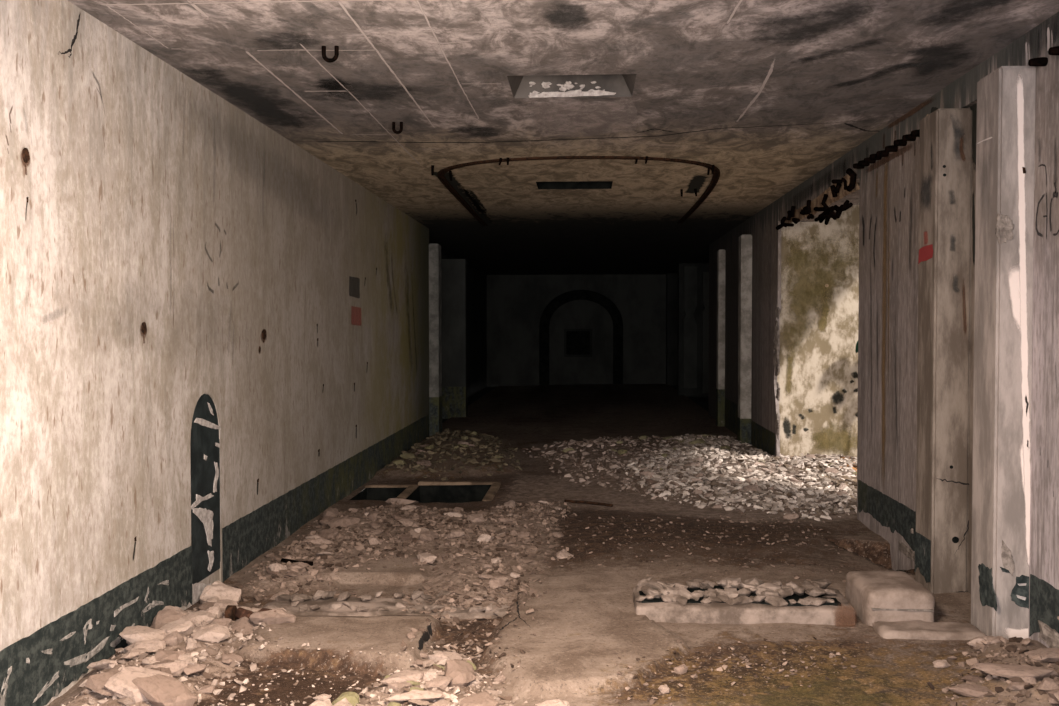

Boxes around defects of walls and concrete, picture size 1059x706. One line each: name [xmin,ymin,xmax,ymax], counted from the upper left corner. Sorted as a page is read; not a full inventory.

water stain [202,71,307,126]
peeling [528,81,616,98]
water stain [784,237,852,393]
peeling [194,402,221,430]
water stain [783,409,813,438]
water stain [832,372,858,413]
peeling [185,455,219,610]
peeling [978,540,1029,611]
peeling [33,580,169,703]